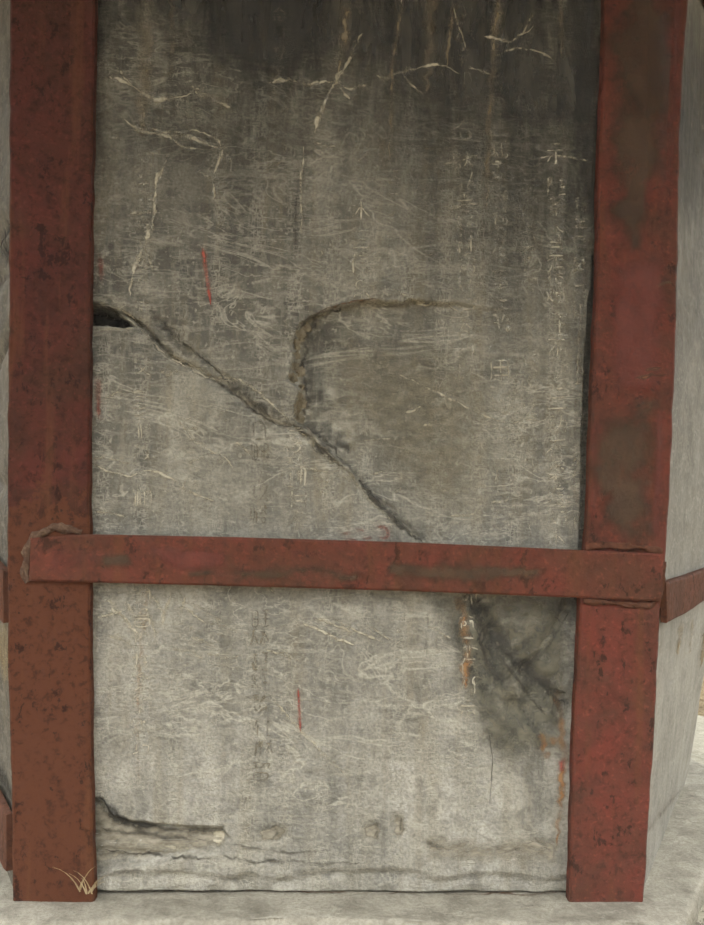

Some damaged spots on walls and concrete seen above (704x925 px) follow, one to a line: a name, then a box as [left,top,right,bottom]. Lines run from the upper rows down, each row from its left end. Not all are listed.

crack [115,311,423,543]
leakage [436,599,569,755]